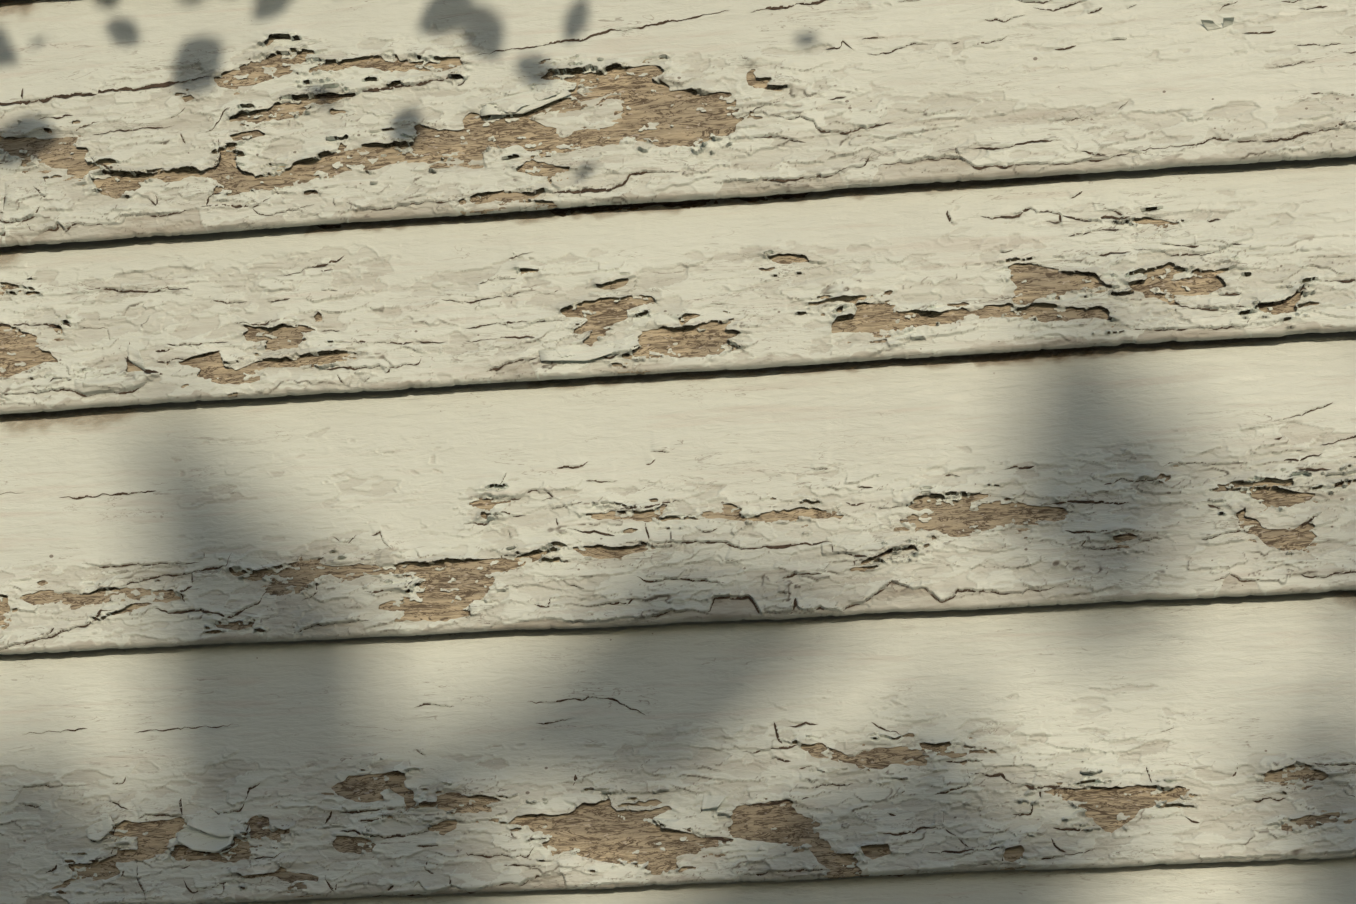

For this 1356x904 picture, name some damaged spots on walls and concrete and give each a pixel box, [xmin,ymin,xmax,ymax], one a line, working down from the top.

peeling [0,28,846,221]
crack [314,0,826,98]
crack [1143,0,1356,151]
peeling [114,311,421,398]
peeling [486,270,755,375]
peeling [795,255,1355,350]
crack [467,462,914,565]
peeling [849,483,1080,575]
crack [1274,403,1356,527]
peeling [25,763,911,901]
crack [740,722,852,806]
crack [883,760,1100,860]